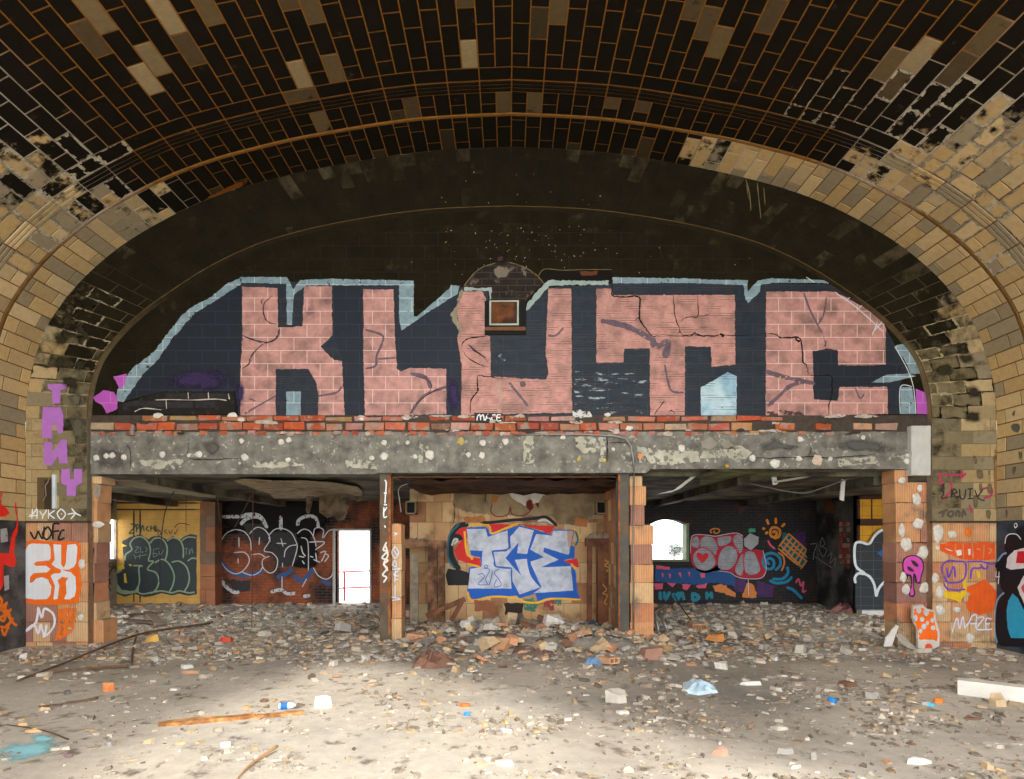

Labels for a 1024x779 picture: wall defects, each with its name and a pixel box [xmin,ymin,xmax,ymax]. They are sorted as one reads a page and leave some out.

water stain [30,288,122,441]
crack [601,279,865,415]
water stain [902,312,997,421]
flaking render [90,371,928,485]
peeling [235,461,363,521]